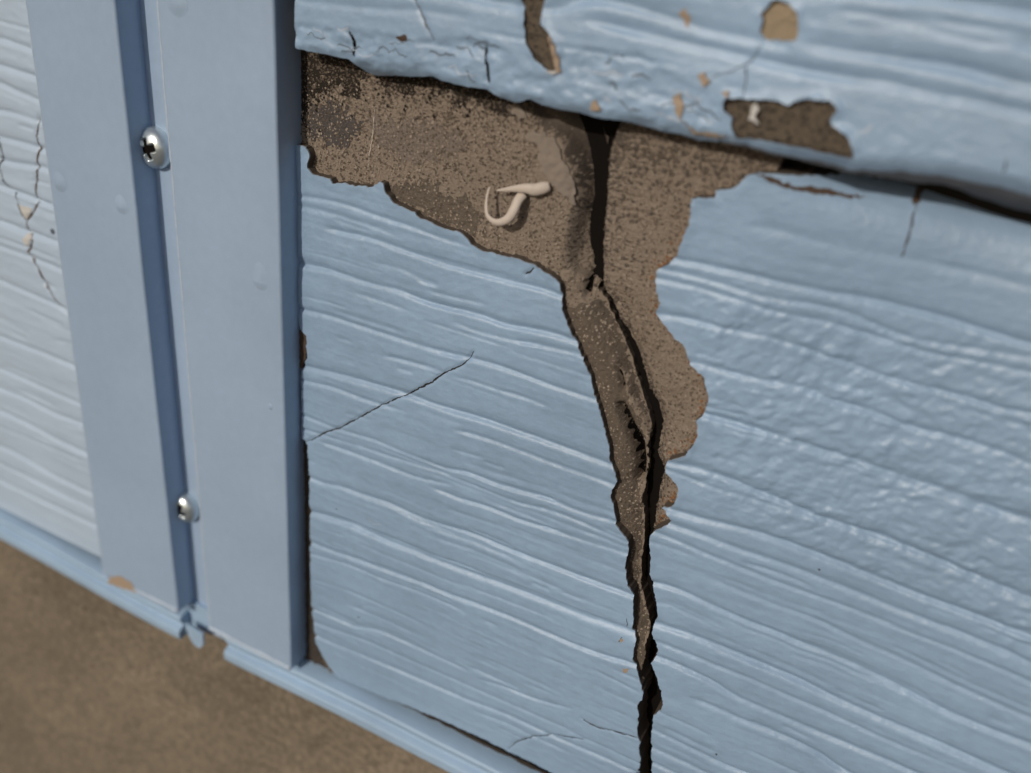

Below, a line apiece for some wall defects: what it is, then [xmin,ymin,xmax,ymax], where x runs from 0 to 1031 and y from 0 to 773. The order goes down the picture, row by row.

peeling [429,35,499,83]
peeling [524,0,561,75]
peeling [761,0,798,41]
crack [0,119,66,309]
peeling [299,330,307,369]
crack [308,351,474,441]
spalling [301,72,865,673]
crack [508,112,665,773]